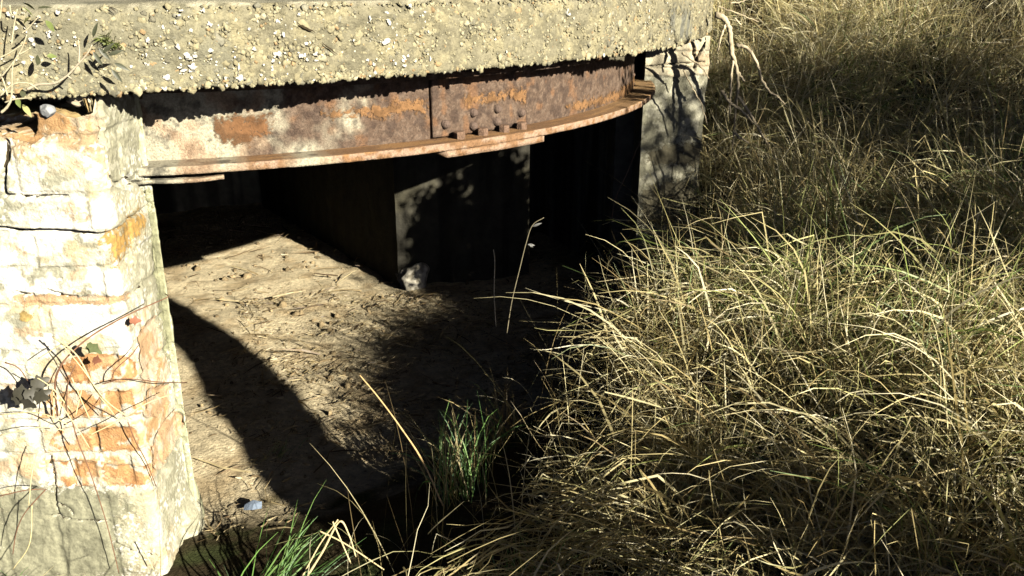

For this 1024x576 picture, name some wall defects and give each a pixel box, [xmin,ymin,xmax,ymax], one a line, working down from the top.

rust [320,97,429,121]
rust [464,87,527,108]
rust [566,72,635,111]
rust [214,112,274,147]
rust [137,172,224,185]
spalling [50,316,184,488]